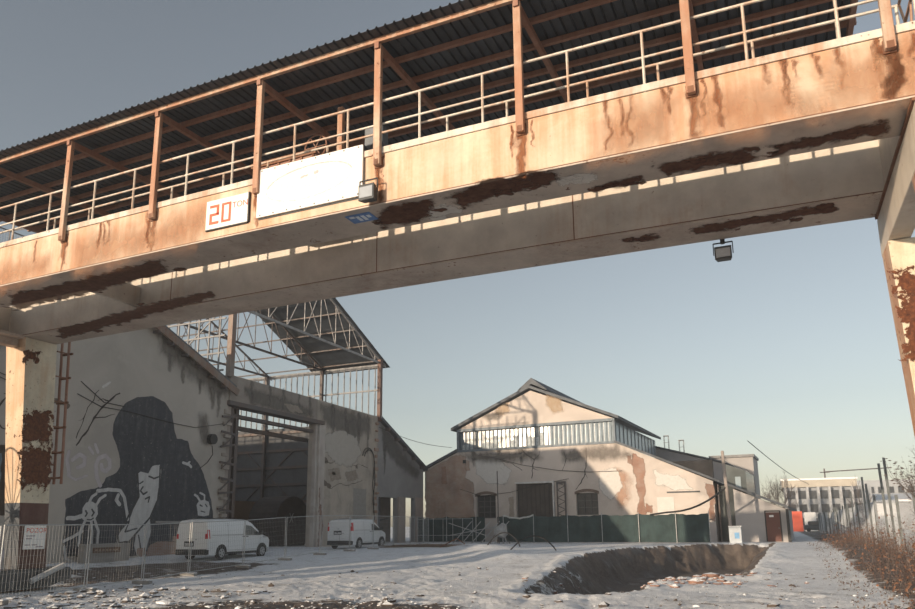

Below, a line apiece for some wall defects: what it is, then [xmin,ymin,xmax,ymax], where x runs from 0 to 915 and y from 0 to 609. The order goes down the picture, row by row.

rust [832,33,915,99]
rust [450,120,560,209]
rust [603,86,672,149]
rust [688,59,796,137]
rust [659,120,891,176]
rust [372,168,447,229]
rust [691,203,839,234]
rust [0,213,204,311]
rust [56,291,215,338]
peeling [599,468,623,500]
spalling [627,453,693,515]
spalling [705,484,716,521]